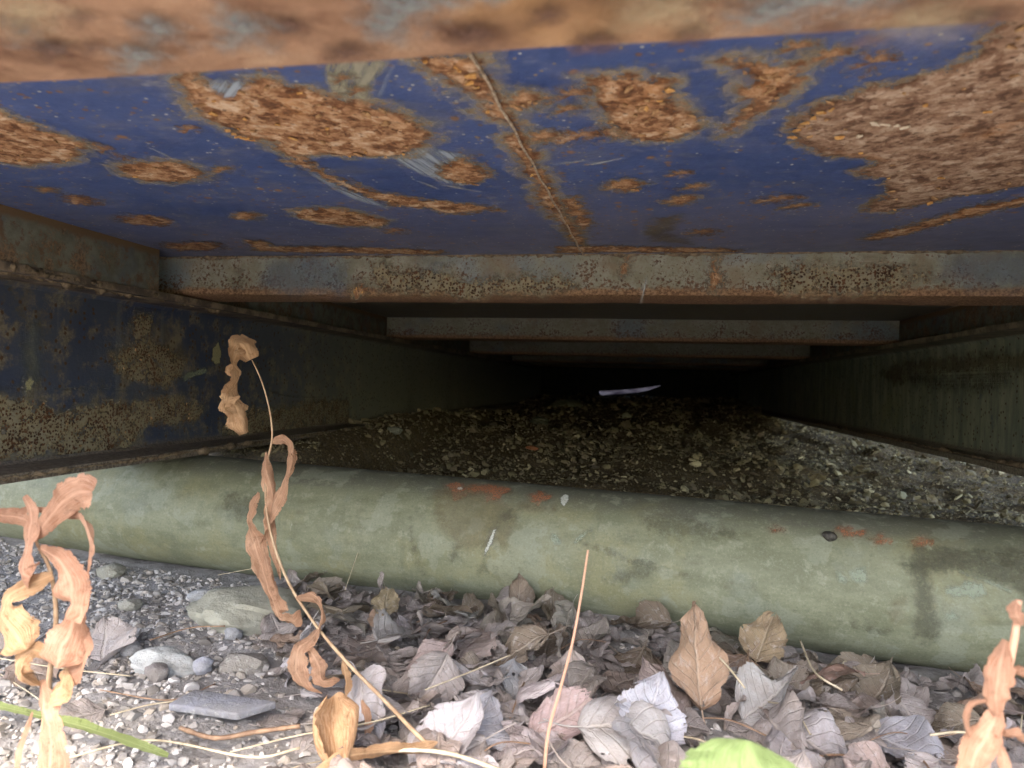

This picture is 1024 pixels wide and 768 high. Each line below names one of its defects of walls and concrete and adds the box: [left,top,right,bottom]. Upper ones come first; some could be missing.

rust [0,107,245,185]
rust [159,20,1024,303]